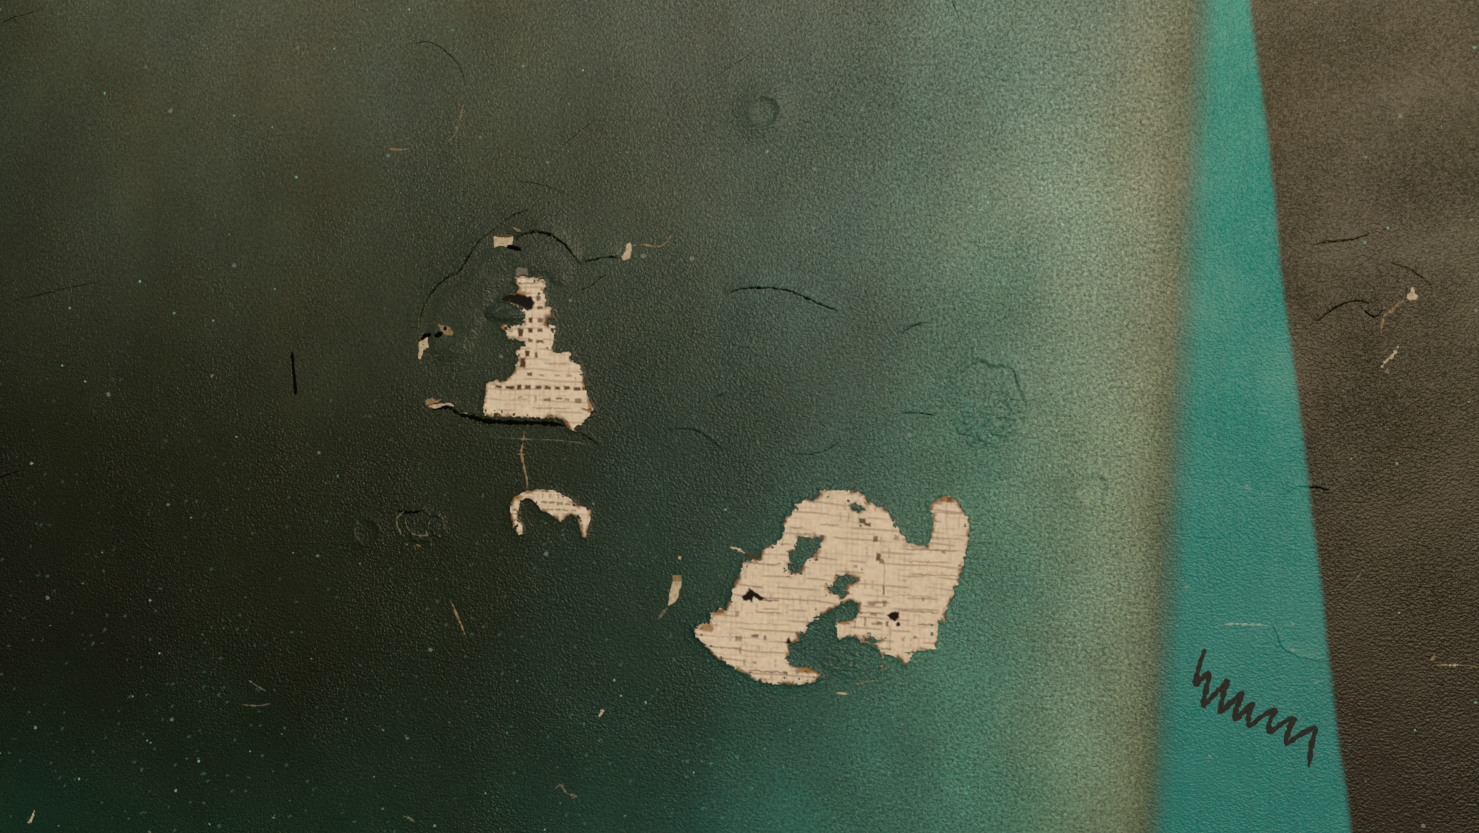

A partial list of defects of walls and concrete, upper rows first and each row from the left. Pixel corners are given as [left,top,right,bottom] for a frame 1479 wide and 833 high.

crack [389,182,622,368]
peeling [418,227,603,547]
crack [1305,279,1418,368]
peeling [683,479,982,696]